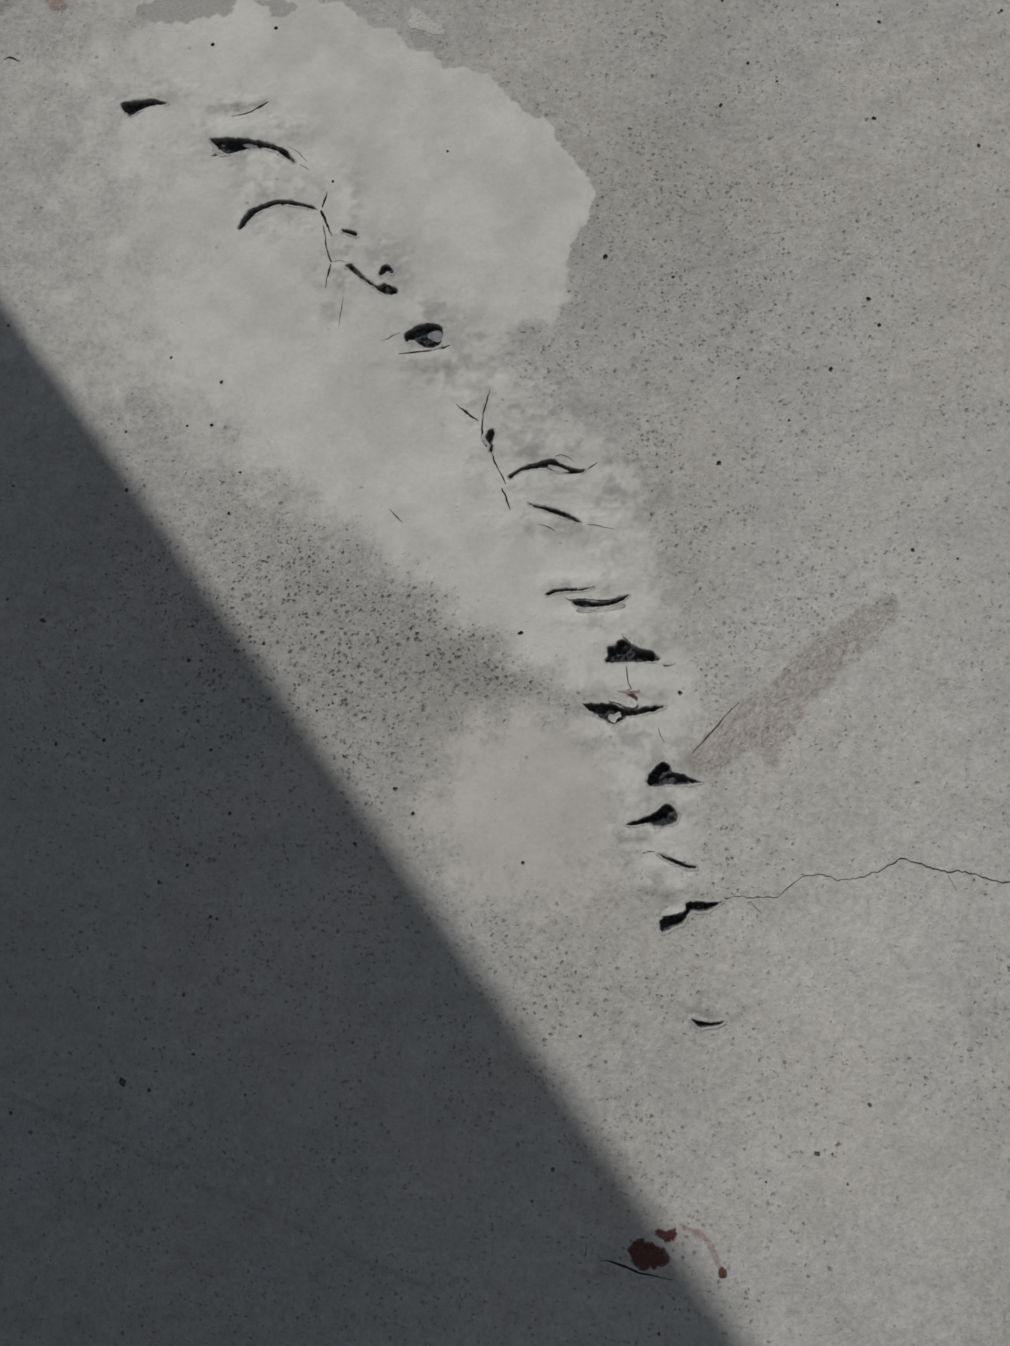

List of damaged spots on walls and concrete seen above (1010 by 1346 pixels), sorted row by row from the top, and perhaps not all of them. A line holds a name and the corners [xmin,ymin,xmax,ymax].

peeling [129,0,305,31]
crack [320,193,344,327]
crack [456,390,510,509]
crack [692,703,738,753]
crack [725,858,1010,912]
corrosion [621,1214,735,1283]